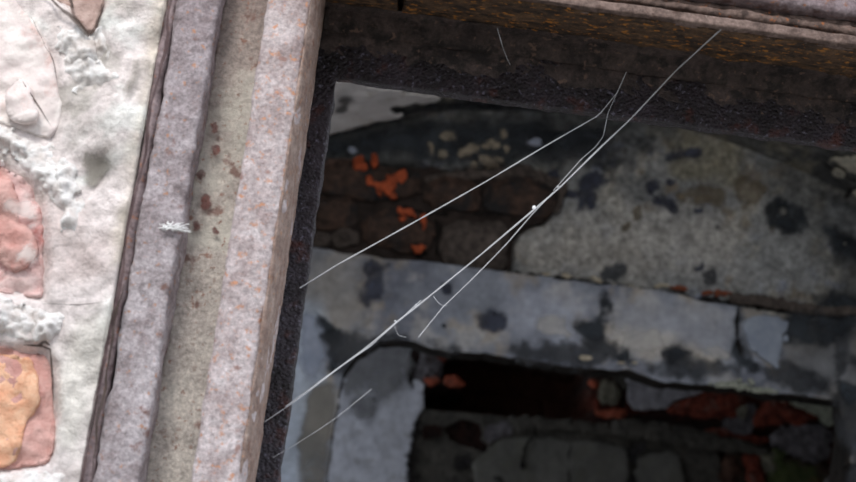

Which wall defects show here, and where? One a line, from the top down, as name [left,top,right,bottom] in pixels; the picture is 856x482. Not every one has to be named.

rust [201,194,211,210]